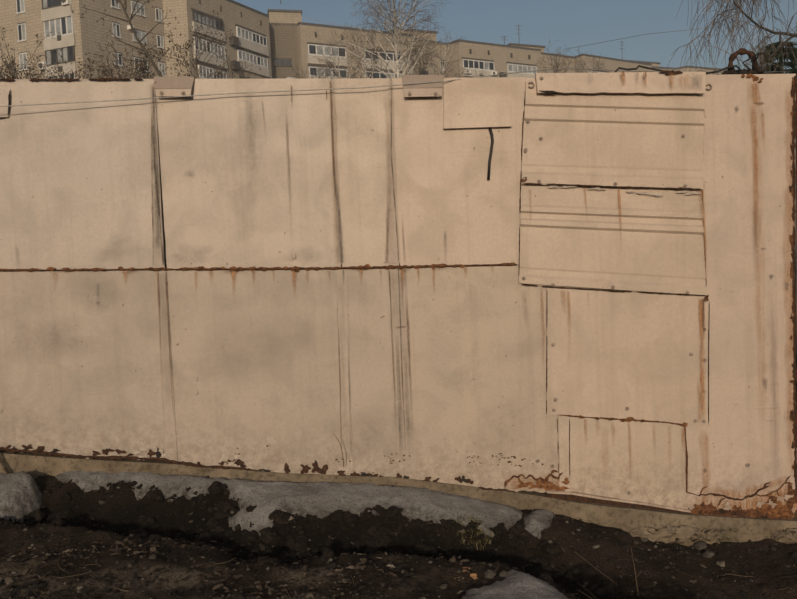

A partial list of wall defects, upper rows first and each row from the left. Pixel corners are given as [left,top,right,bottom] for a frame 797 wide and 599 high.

rust [0,262,516,279]
rust [562,76,797,519]
rust [521,284,709,410]
rust [0,444,271,472]
rust [284,457,383,477]
rust [454,475,504,491]